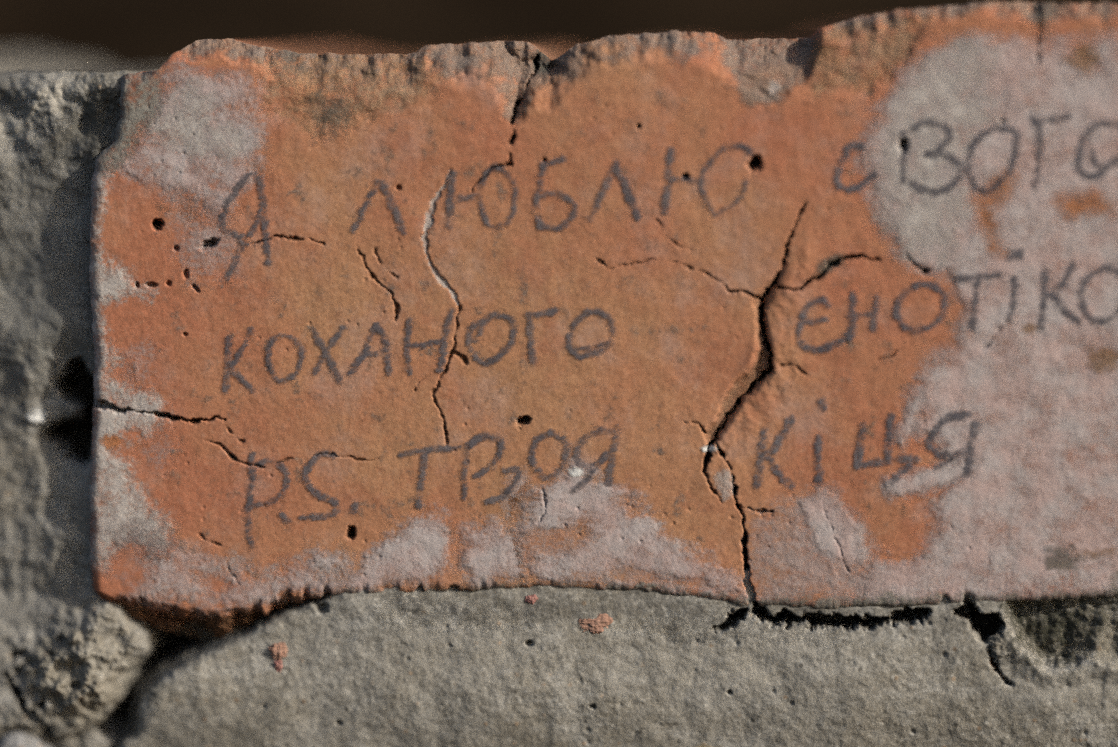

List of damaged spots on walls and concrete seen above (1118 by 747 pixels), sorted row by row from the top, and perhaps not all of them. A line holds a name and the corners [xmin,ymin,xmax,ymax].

crack [479,54,538,181]
damp [534,50,555,73]
crack [93,401,292,467]
damp [0,63,747,618]
crack [359,251,399,320]
crack [422,183,467,436]
crack [656,207,879,569]
damp [752,29,1118,705]
crack [954,601,974,619]
damp [593,635,855,714]